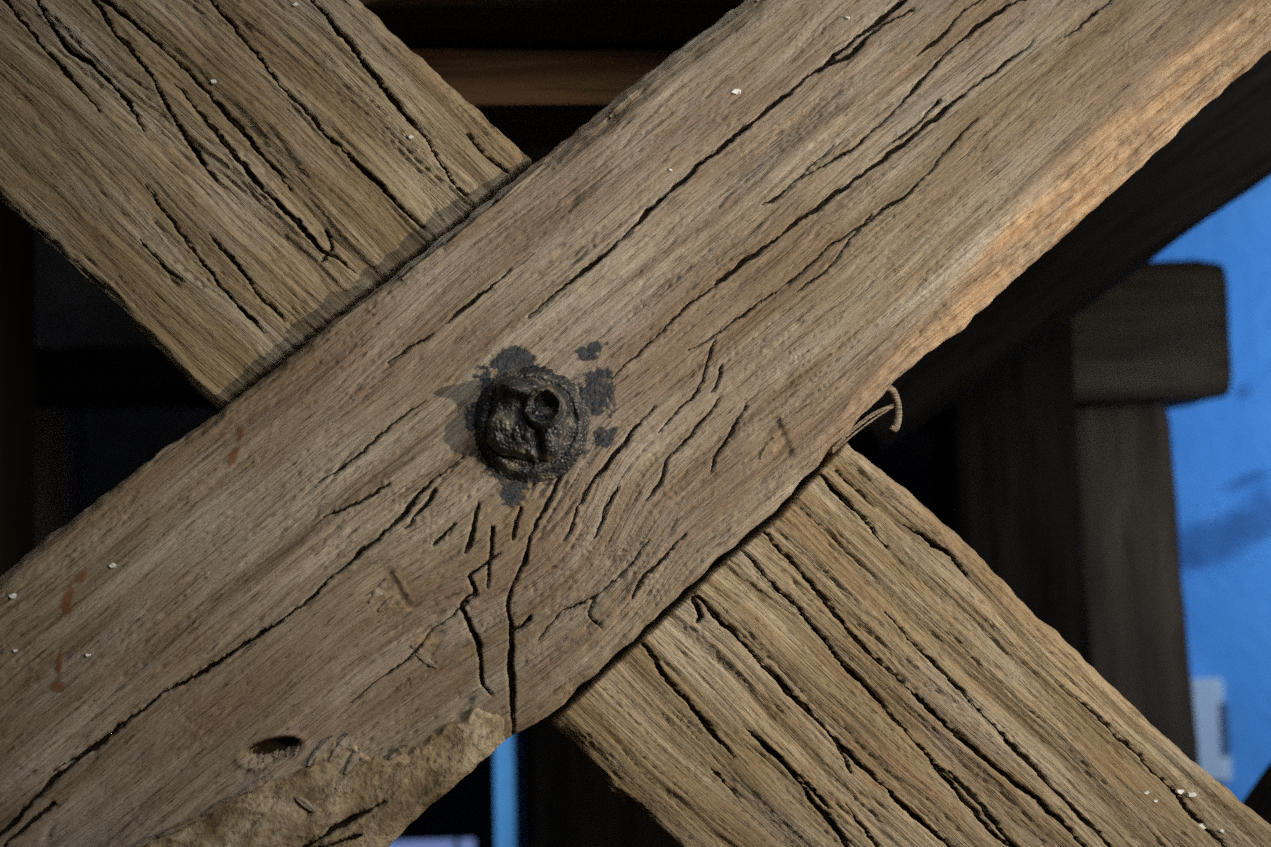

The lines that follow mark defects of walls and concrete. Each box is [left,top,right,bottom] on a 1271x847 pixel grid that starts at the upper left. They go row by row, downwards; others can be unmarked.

crack [4,0,145,131]
crack [141,185,285,333]
crack [92,0,356,273]
crack [211,0,456,281]
crack [350,0,1032,735]
crack [1065,1,1111,37]
crack [0,456,464,847]
crack [637,587,949,847]
crack [736,526,1112,847]
crack [1076,697,1225,847]